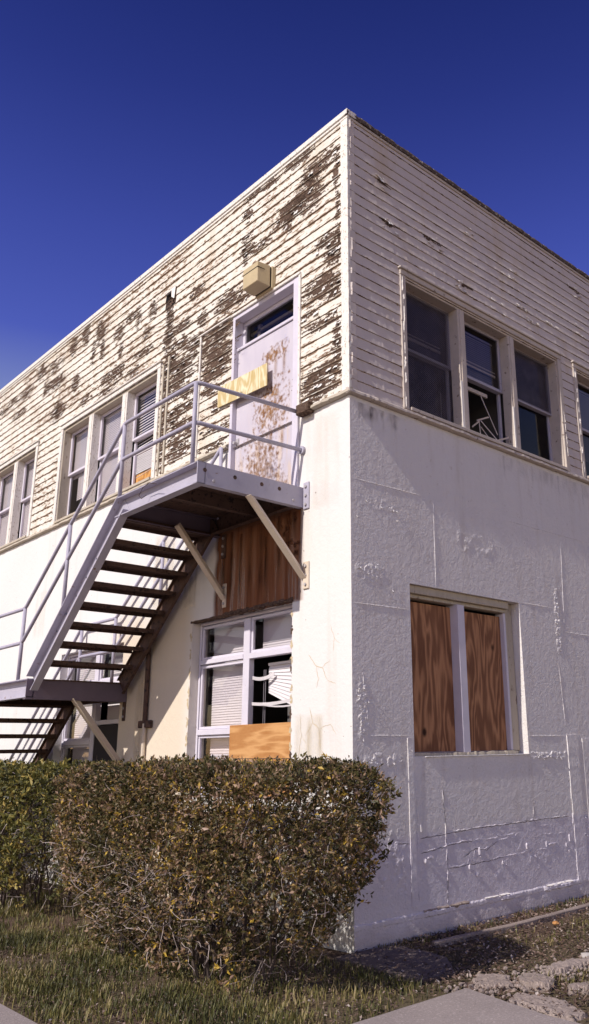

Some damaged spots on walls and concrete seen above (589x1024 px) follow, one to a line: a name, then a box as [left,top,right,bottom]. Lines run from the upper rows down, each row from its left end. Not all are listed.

peeling [238,118,353,403]
peeling [0,283,251,474]
corrosion [247,371,290,482]
crack [370,763,578,896]